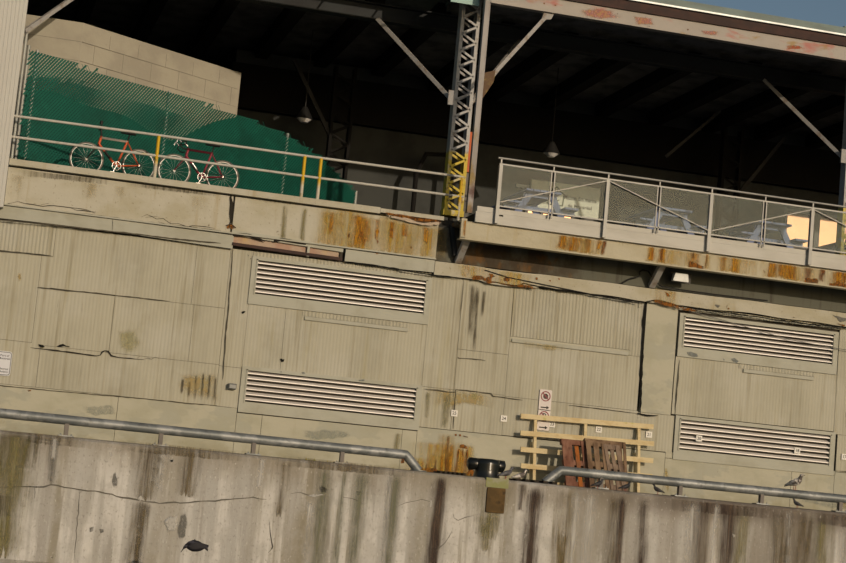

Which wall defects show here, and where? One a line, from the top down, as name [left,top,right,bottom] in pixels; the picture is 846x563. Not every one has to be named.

corrosion [232,242,343,261]
corrosion [324,212,439,255]
corrosion [462,267,538,289]
corrosion [559,236,606,253]
corrosion [654,292,696,312]
corrosion [768,263,846,288]
leakage [0,432,61,559]
crack [0,474,266,563]
leakage [131,445,211,563]
leakage [307,460,378,563]
leakage [385,479,399,563]
leakage [607,500,625,563]